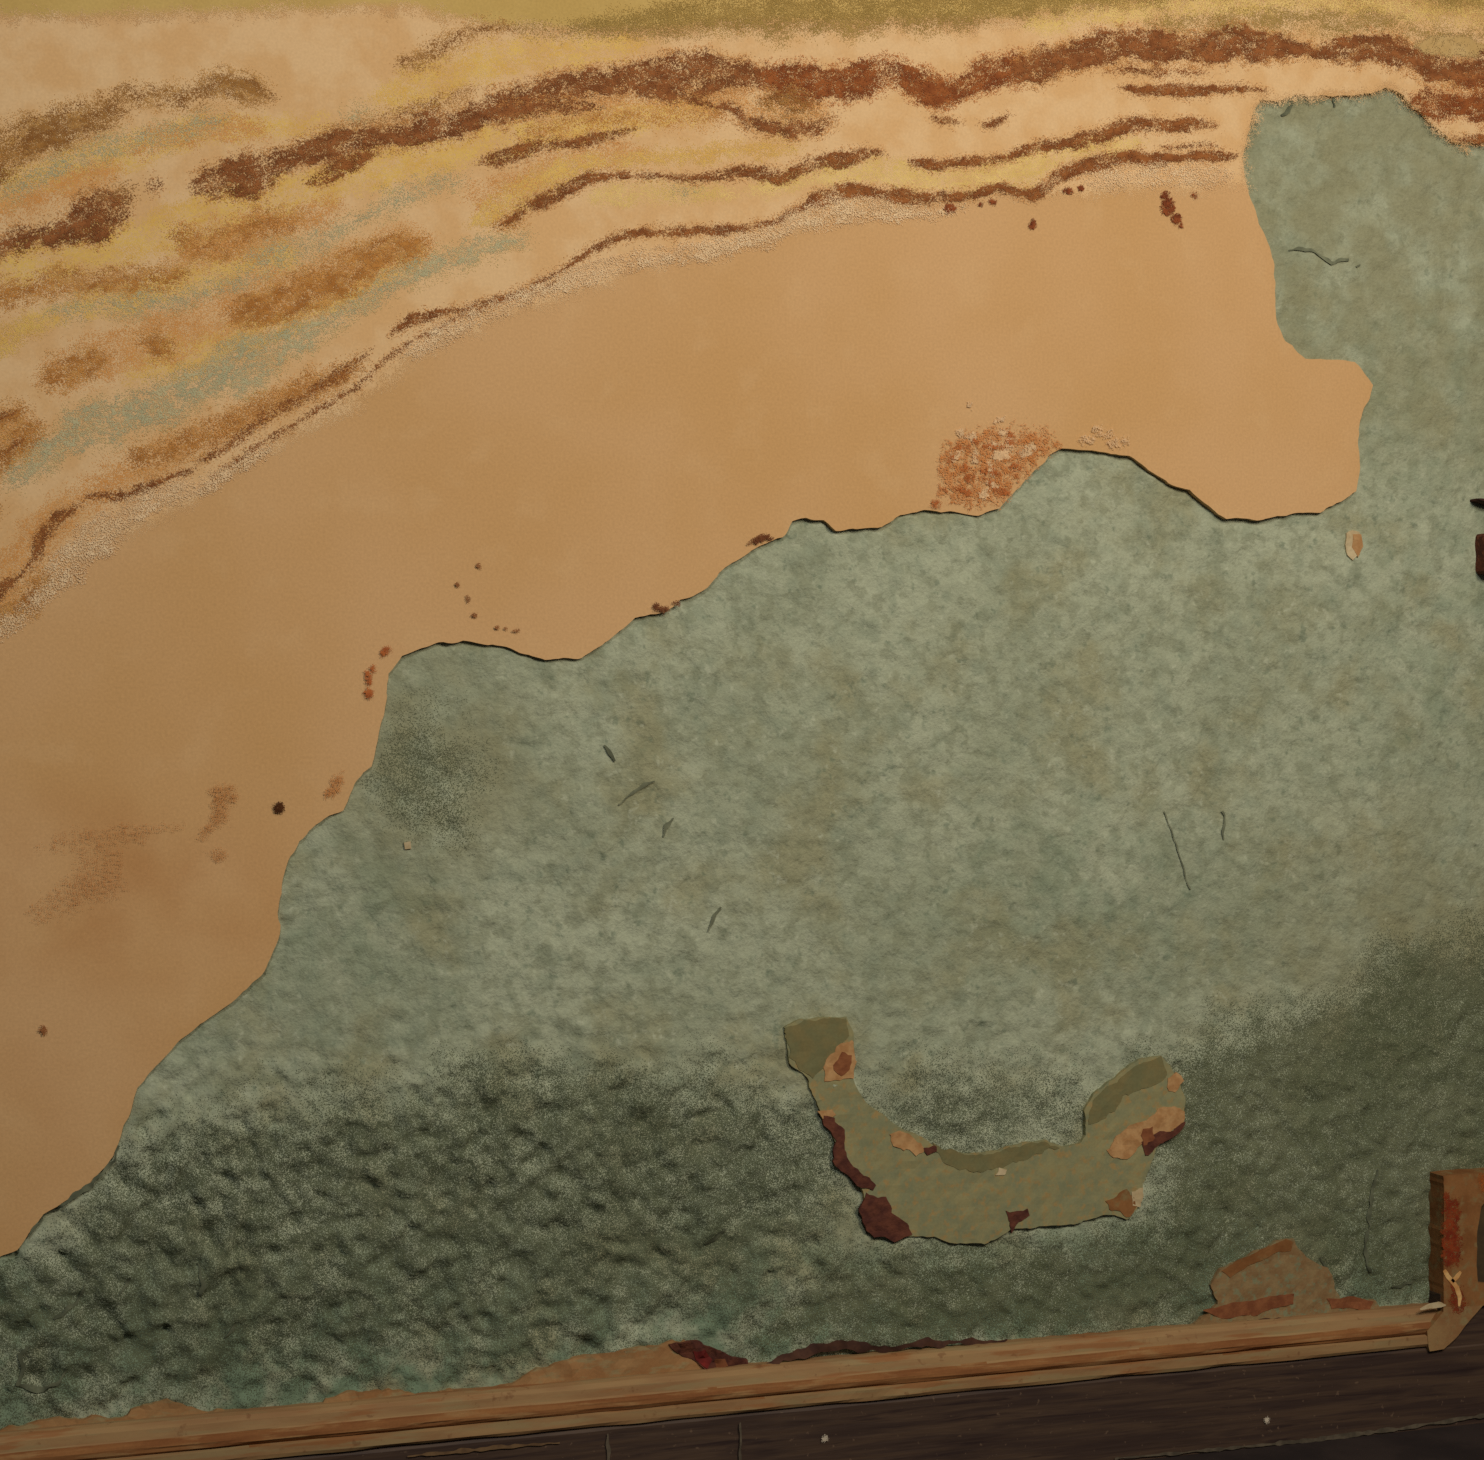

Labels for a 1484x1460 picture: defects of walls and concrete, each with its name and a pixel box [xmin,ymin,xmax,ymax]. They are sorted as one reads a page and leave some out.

damp [0,0,1484,643]
rust [931,415,1062,513]
peeling [1344,530,1363,560]
damp [0,901,1484,1429]
peeling [783,1016,1198,1244]
flaking render [930,1235,1429,1346]
rust [1440,1191,1470,1315]
flaking render [505,1339,704,1386]
spalling [669,1340,748,1369]